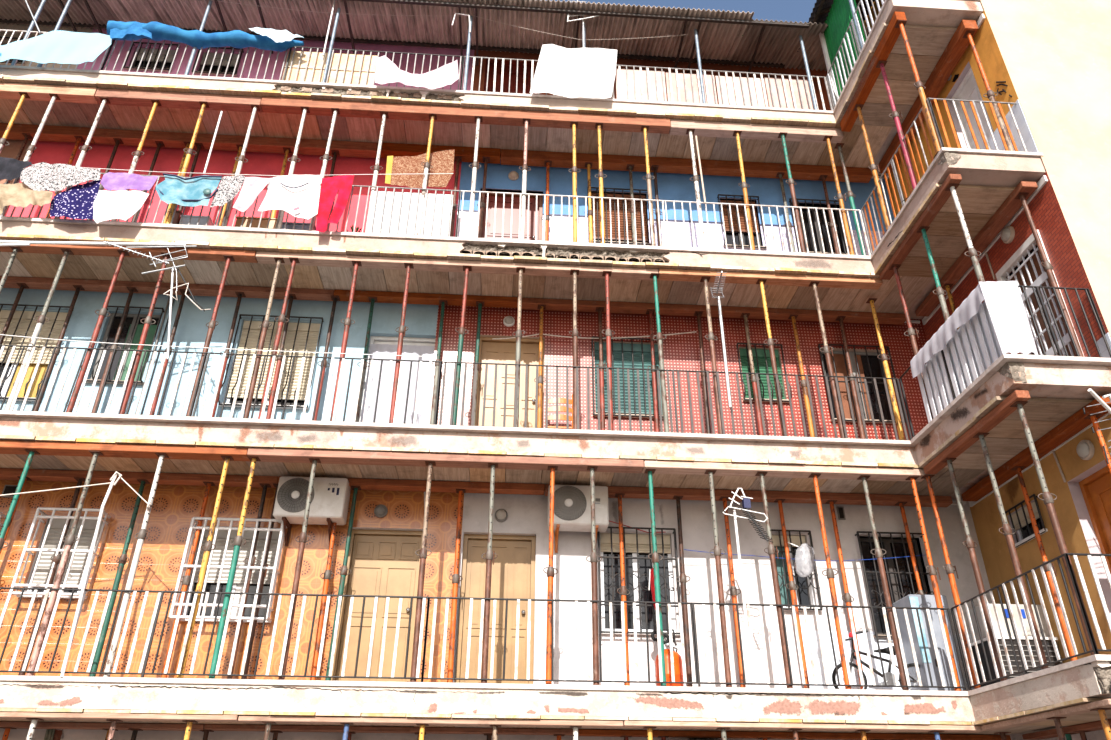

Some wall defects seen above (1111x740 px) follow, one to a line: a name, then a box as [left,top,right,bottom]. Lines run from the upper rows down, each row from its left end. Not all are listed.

spalling [1091,661,1111,694]
peeling [635,696,704,709]
peeling [763,698,859,716]
peeling [903,701,957,714]